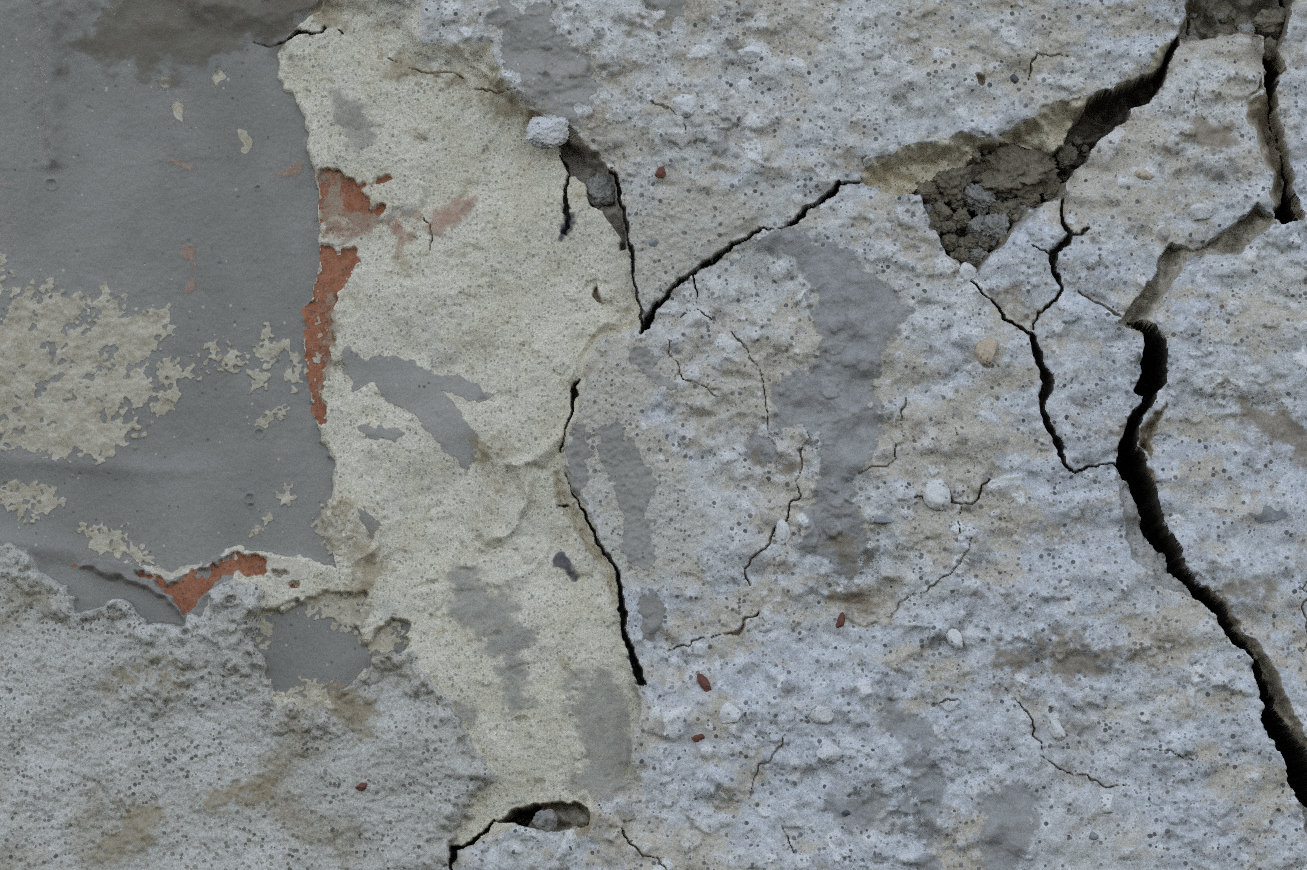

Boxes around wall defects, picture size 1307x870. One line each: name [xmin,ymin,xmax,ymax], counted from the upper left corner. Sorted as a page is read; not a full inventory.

peeling [237,128,253,154]
peeling [331,88,377,148]
peeling [314,167,424,232]
spalling [912,142,1066,273]
peeling [0,245,491,475]
crack [554,37,1307,833]
peeling [0,479,66,529]
peeling [70,483,412,659]
peeling [446,565,541,720]
peeling [496,668,631,832]
crack [449,820,496,870]
crack [622,828,668,870]